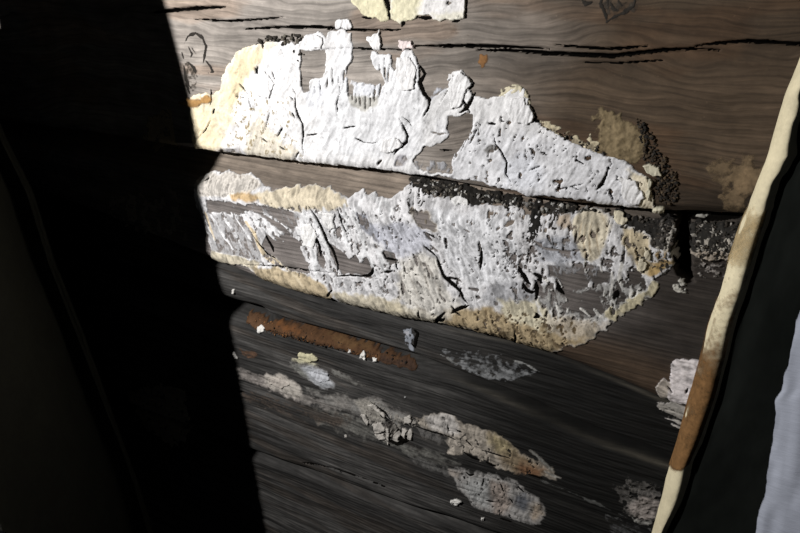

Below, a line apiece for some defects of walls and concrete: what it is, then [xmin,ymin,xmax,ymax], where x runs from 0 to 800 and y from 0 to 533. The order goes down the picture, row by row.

crack [153,5,800,64]
water stain [179,0,766,353]
spalling [652,58,800,533]
corrosion [246,309,417,371]
spalling [360,399,417,446]